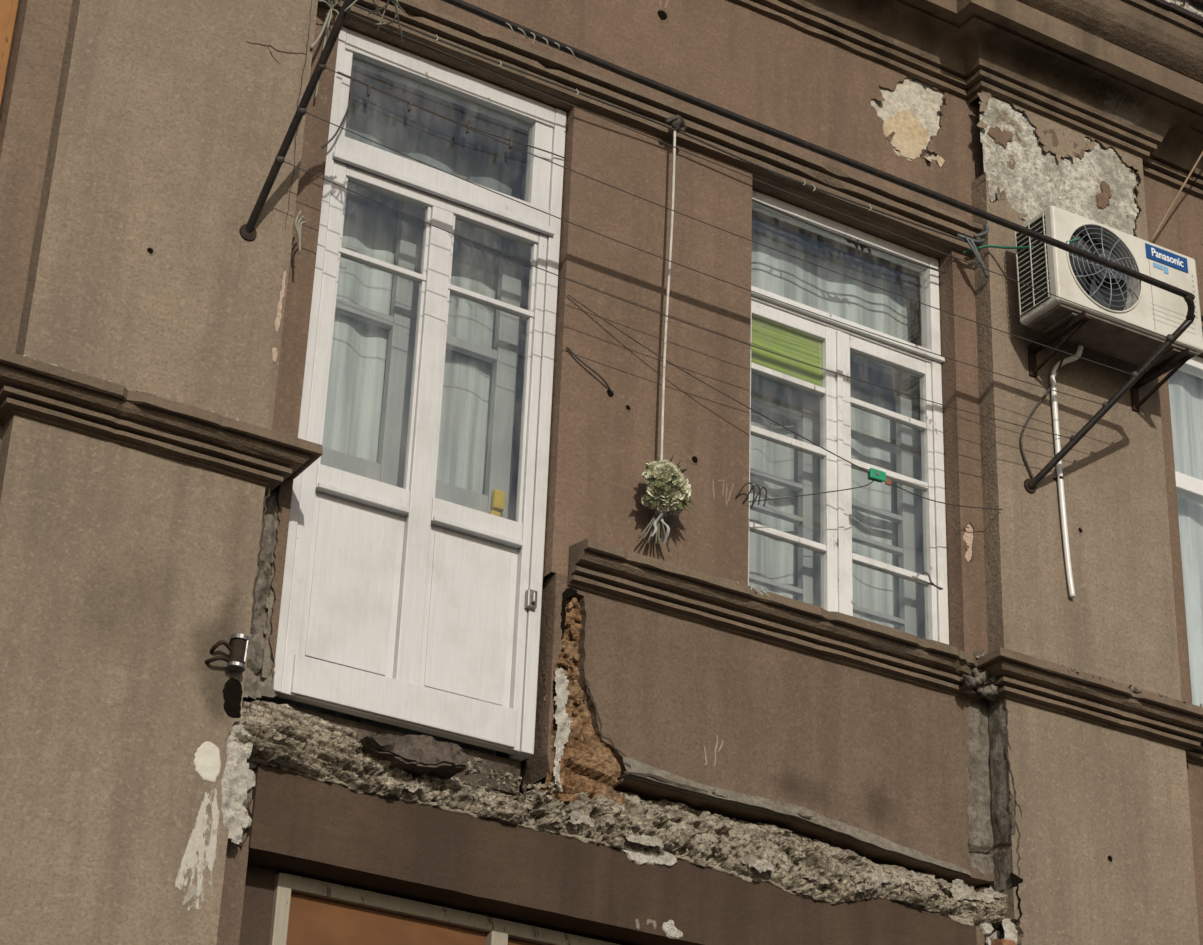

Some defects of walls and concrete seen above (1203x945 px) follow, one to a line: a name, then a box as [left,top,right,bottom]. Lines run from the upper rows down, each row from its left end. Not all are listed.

peeling [871,78,947,167]
peeling [977,92,1142,236]
efflorescence [175,789,220,910]
spalling [194,489,1023,945]
crack [1004,697,1022,877]